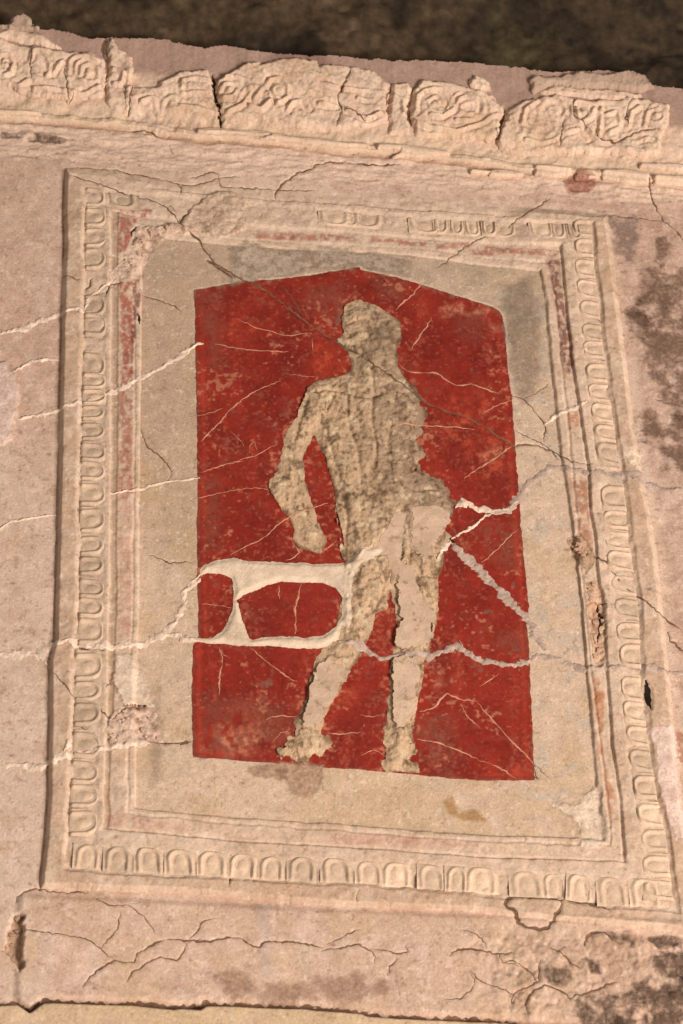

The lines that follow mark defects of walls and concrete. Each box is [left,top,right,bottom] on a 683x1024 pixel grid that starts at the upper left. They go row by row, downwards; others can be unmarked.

flaking render [109,191,246,288]
water stain [627,238,683,470]
crack [0,161,683,779]
flaking render [567,533,596,569]
flaking render [585,581,606,667]
flaking render [5,916,24,969]
crack [0,888,618,1024]
water stain [576,936,683,1024]